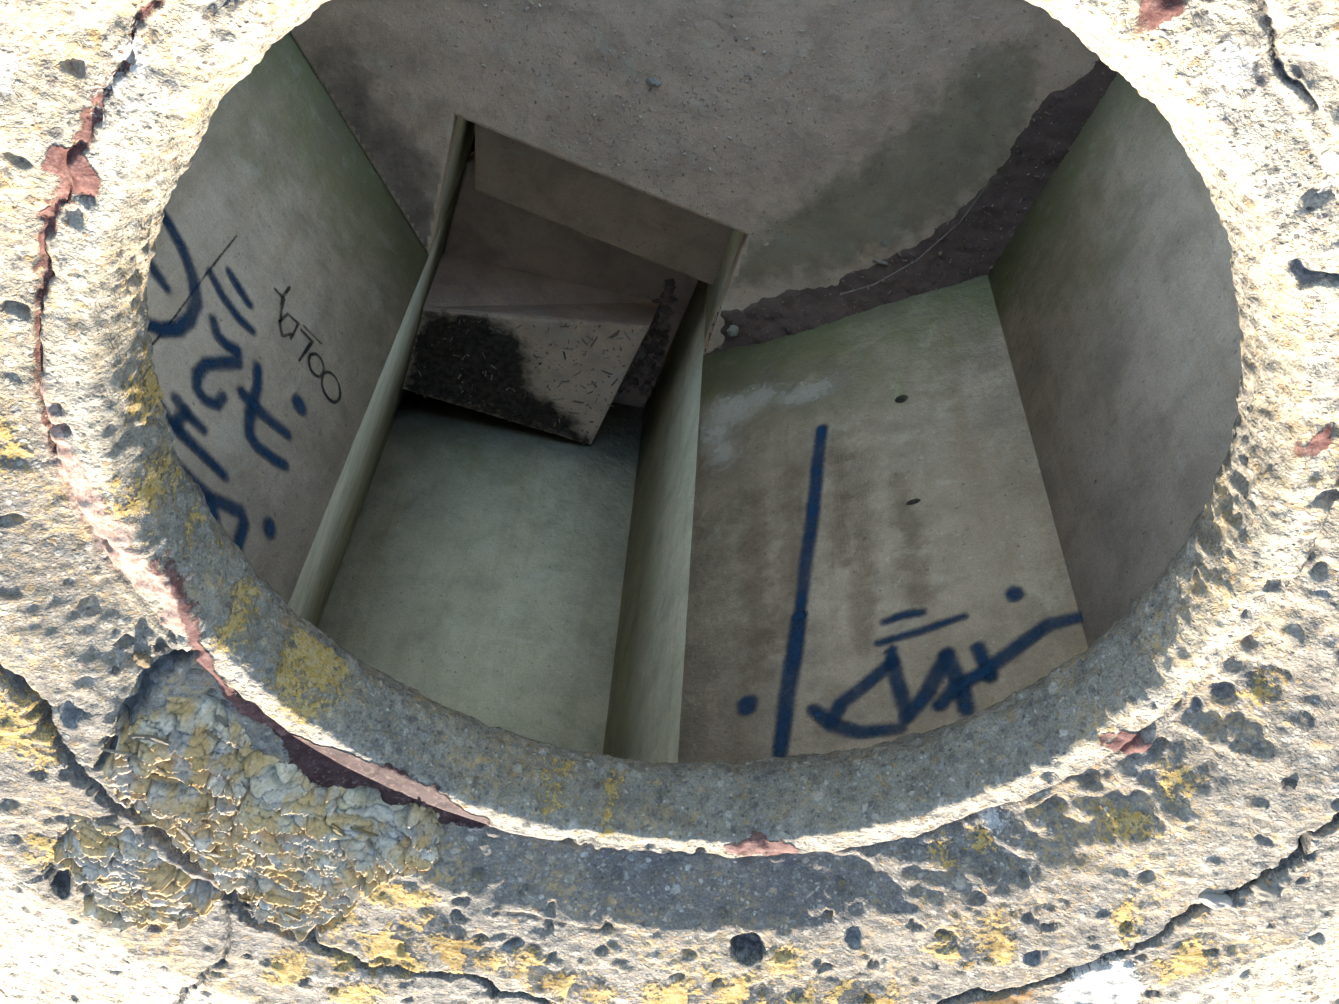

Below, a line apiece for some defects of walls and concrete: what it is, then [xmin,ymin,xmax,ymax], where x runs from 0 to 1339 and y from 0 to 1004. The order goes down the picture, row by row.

crack [1256,0,1314,99]
crack [152,235,237,346]
crack [111,636,203,680]
crack [0,664,199,868]
spalling [51,689,445,942]
crack [1280,779,1298,794]
crack [1102,812,1339,955]
crack [172,889,357,1004]
crack [488,980,506,1004]
crack [936,987,1012,1004]